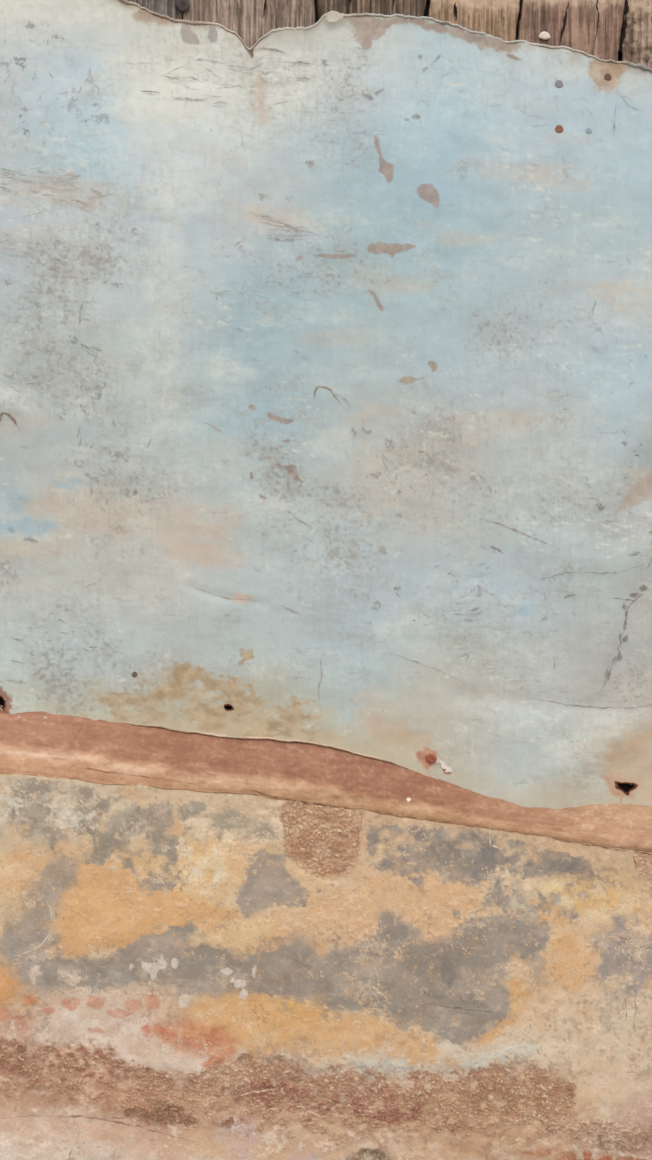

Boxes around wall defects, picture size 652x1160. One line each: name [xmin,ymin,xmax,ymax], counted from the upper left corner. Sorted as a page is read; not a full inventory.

rust [586,58,628,96]
peeling [373,135,395,184]
peeling [416,183,441,209]
crack [530,557,652,710]
rust [0,684,18,714]
peeling [0,775,652,1160]
leakage [412,956,490,1011]
rust [573,1152,649,1160]